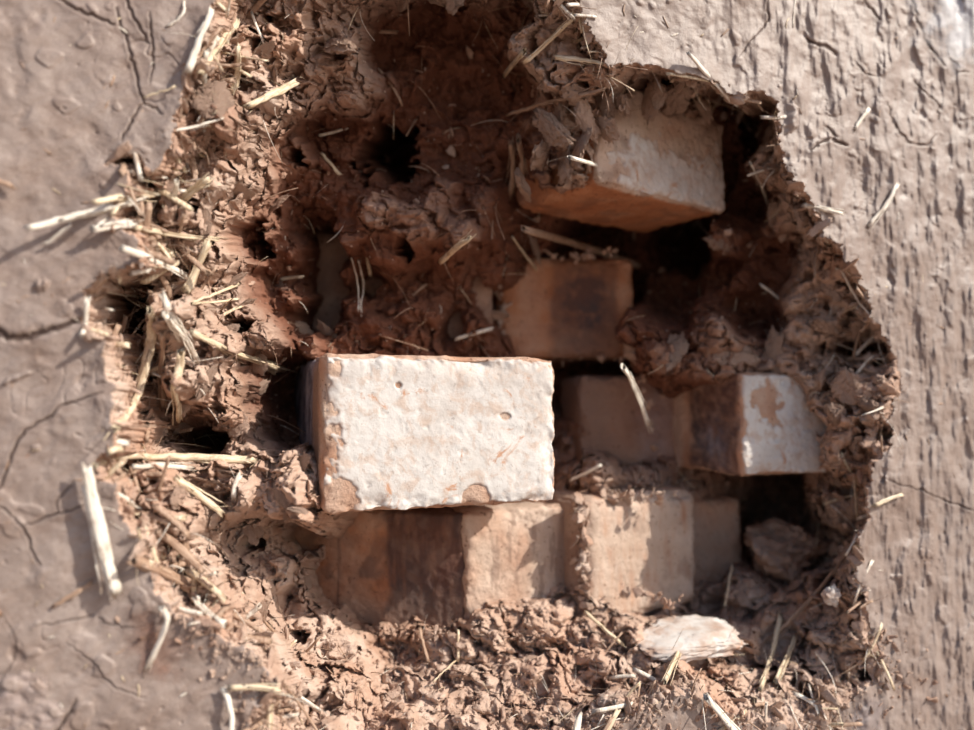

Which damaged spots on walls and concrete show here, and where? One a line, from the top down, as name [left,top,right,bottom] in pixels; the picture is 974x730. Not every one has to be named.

crack [61,0,161,141]
crack [806,38,873,76]
crack [887,81,941,146]
crack [811,126,847,150]
spalling [109,205,142,224]
crack [0,319,83,340]
crack [0,392,102,566]
spalling [94,459,166,512]
spalling [128,520,192,578]
spalling [153,573,195,609]
flaking render [820,583,841,607]
spalling [239,689,315,730]